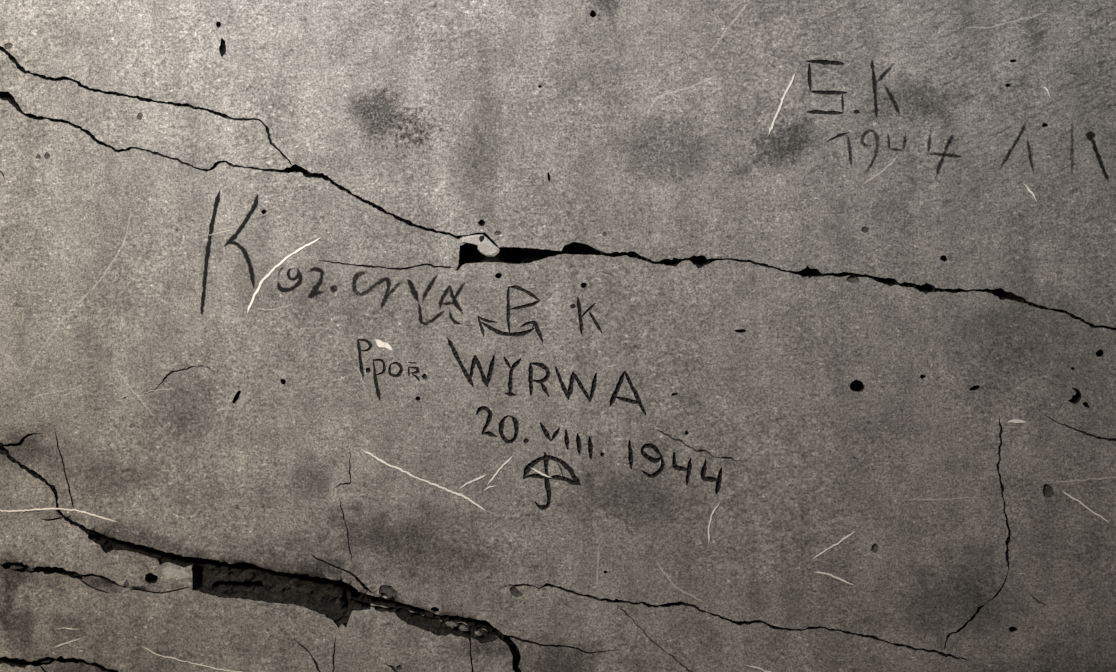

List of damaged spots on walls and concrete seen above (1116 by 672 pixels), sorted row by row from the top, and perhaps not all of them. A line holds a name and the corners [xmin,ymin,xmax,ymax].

crack [0,46,1116,330]
flaking render [462,219,502,257]
crack [121,365,215,399]
crack [0,433,216,594]
flaking render [192,560,498,644]
crack [311,449,613,672]
crack [497,415,1049,672]
crack [0,656,119,672]
crack [294,637,336,672]